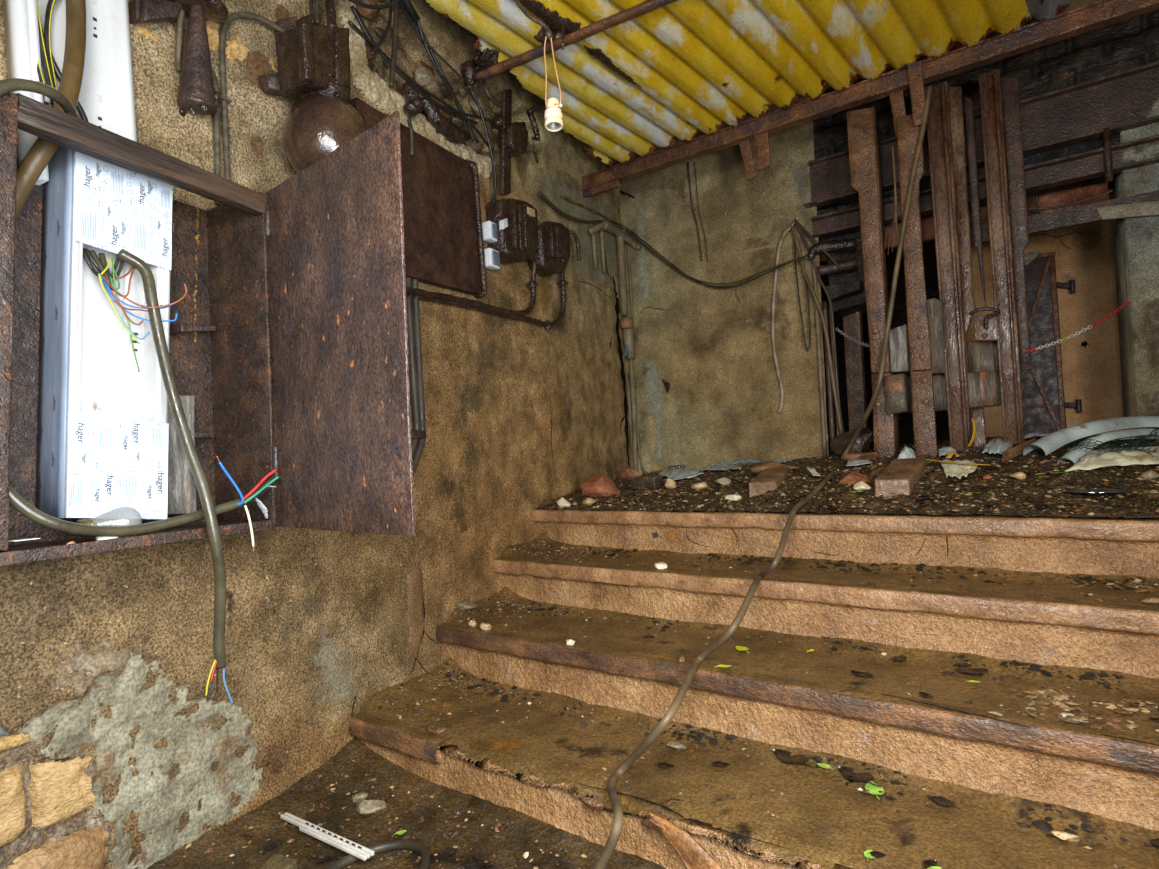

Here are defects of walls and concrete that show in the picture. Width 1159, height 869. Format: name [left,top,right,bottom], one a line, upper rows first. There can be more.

crack [580,254,669,468]
flaking render [0,652,263,869]
peeling [641,811,723,869]